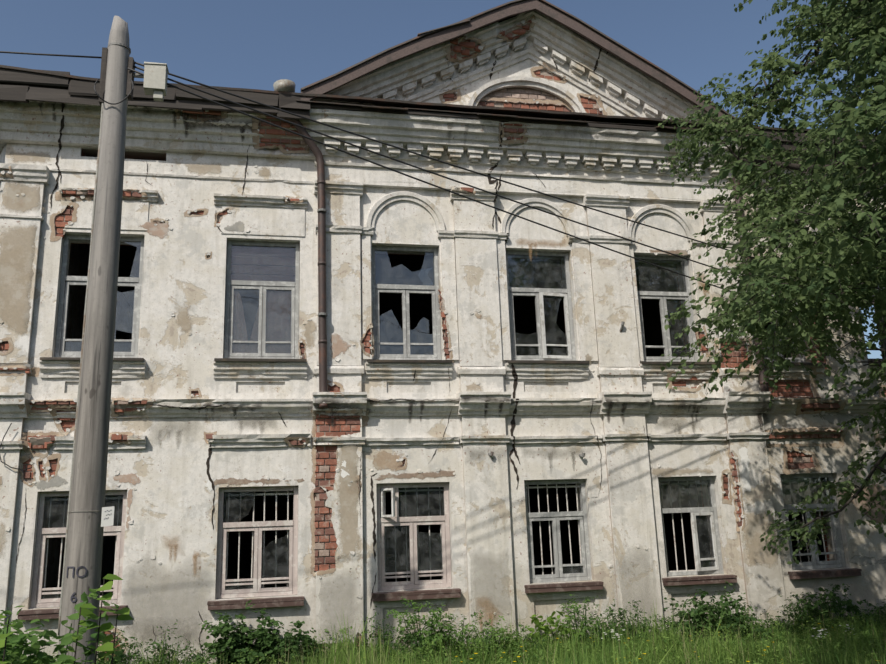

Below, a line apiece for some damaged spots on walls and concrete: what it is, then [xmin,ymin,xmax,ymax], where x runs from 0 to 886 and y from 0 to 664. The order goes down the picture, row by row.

crack [50,103,65,206]
flaking render [122,189,148,200]
crack [488,124,508,253]
flaking render [477,62,607,145]
flaking render [0,152,95,377]
flaking render [17,398,77,491]
crack [206,442,215,528]
flaking render [206,408,455,579]
crack [359,452,377,609]
crack [509,364,520,489]
flaking render [649,447,778,564]
flaking render [765,339,886,475]